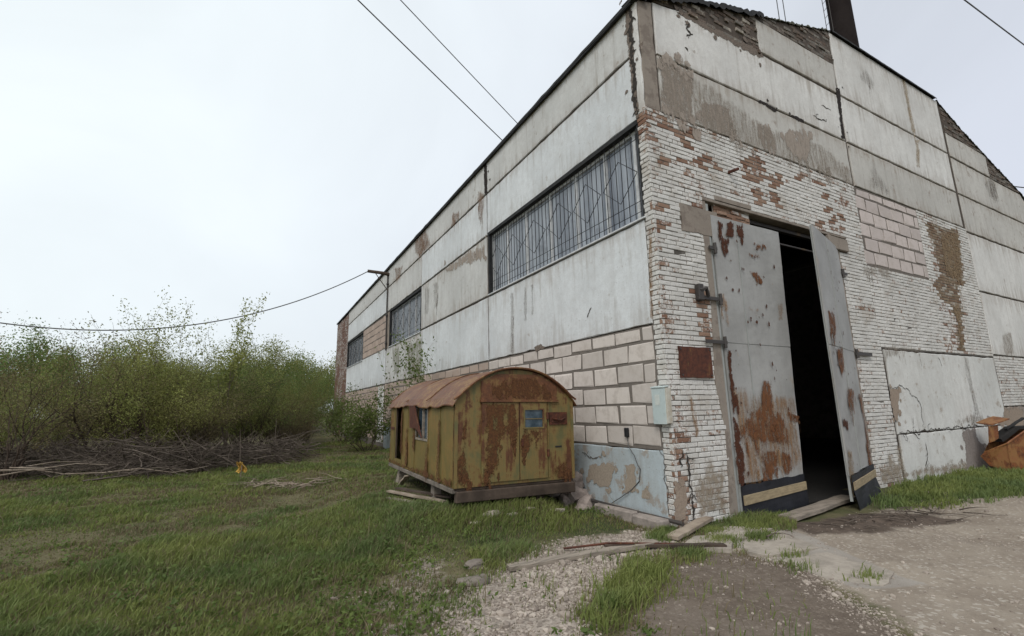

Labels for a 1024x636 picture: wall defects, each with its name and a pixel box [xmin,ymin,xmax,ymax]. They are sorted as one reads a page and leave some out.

peeling [619,0,846,233]
flaking render [925,222,966,351]
corrosion [828,311,849,375]
corrosion [389,378,552,491]
peeling [579,451,650,499]
crack [660,452,697,520]
corrosion [728,350,800,486]
corrosion [843,389,872,465]
crack [894,385,984,470]